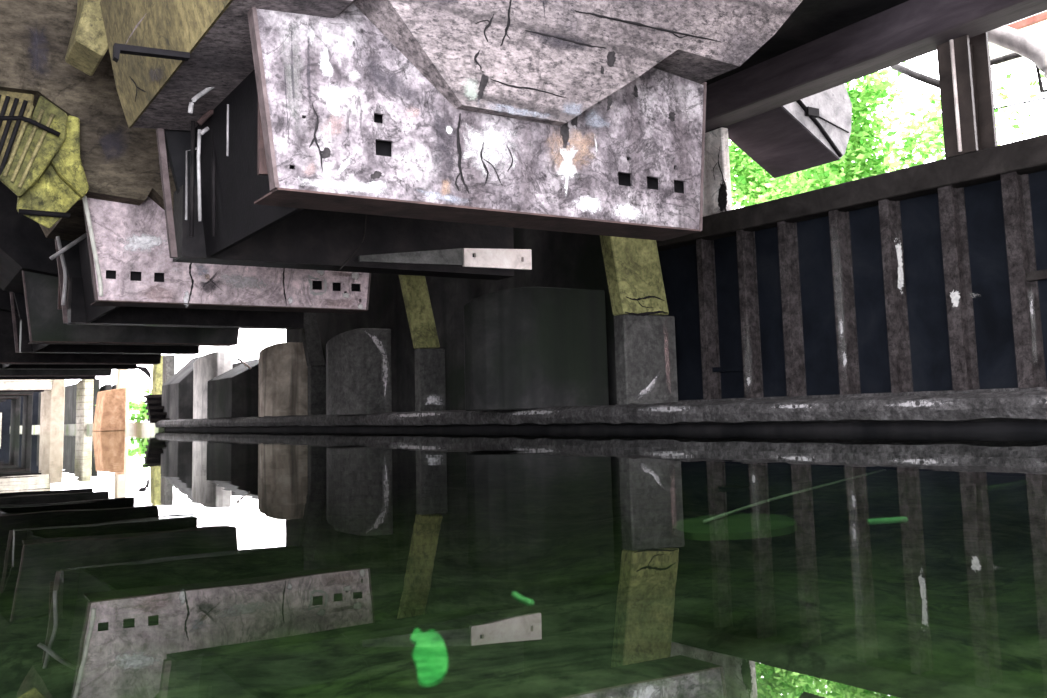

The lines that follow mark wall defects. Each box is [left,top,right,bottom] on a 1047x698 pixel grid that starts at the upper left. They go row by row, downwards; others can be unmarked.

crack [474,0,605,98]
crack [575,10,720,42]
crack [455,113,513,193]
crack [625,296,668,316]